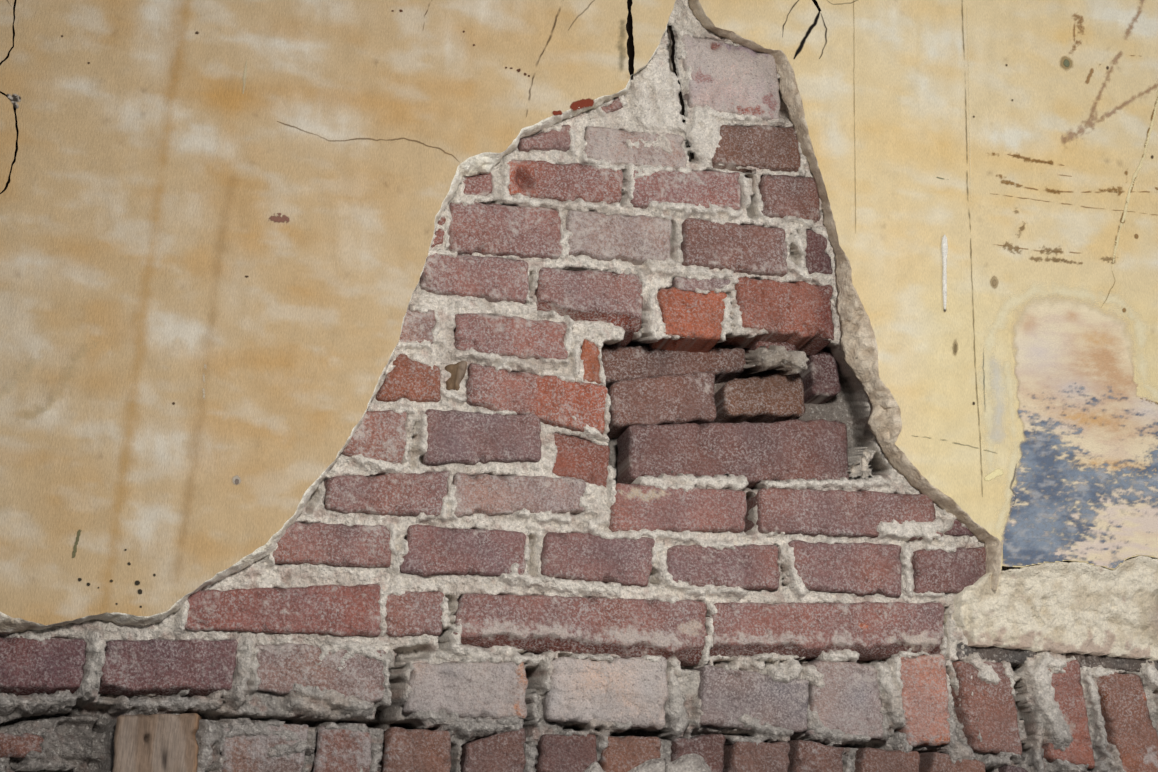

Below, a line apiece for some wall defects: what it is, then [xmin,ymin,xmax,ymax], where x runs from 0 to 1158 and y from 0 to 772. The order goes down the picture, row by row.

crack [626,0,635,80]
crack [782,0,827,59]
crack [0,0,21,194]
flaking render [421,363,608,466]
flaking render [0,347,450,637]
flaking render [452,472,587,518]
peeling [952,284,1158,672]
flaking render [540,532,655,587]
flaking render [709,601,945,662]
flaking render [255,643,385,703]
flaking render [542,656,669,732]
flaking render [694,660,884,739]